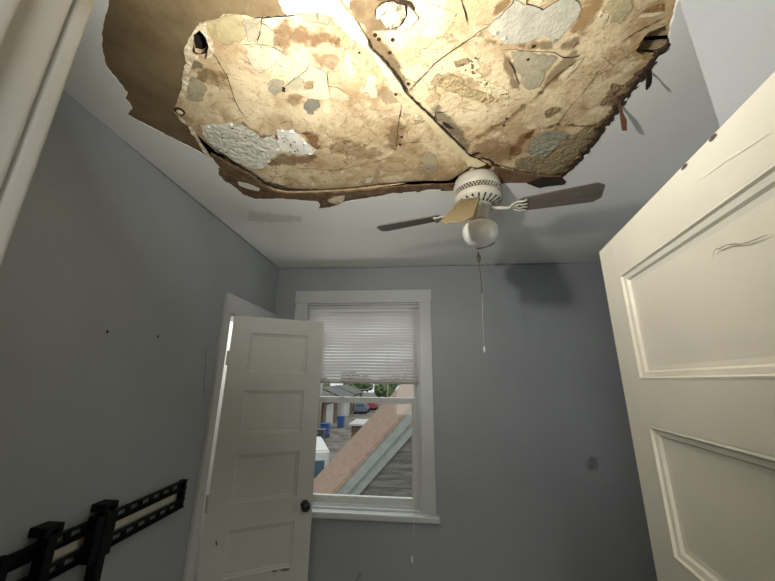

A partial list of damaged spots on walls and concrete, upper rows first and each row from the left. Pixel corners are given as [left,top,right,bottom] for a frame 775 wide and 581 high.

crack [243,14,299,53]
flaking render [175,0,676,208]
crack [286,0,582,182]
crack [508,39,606,131]
crack [712,234,769,258]